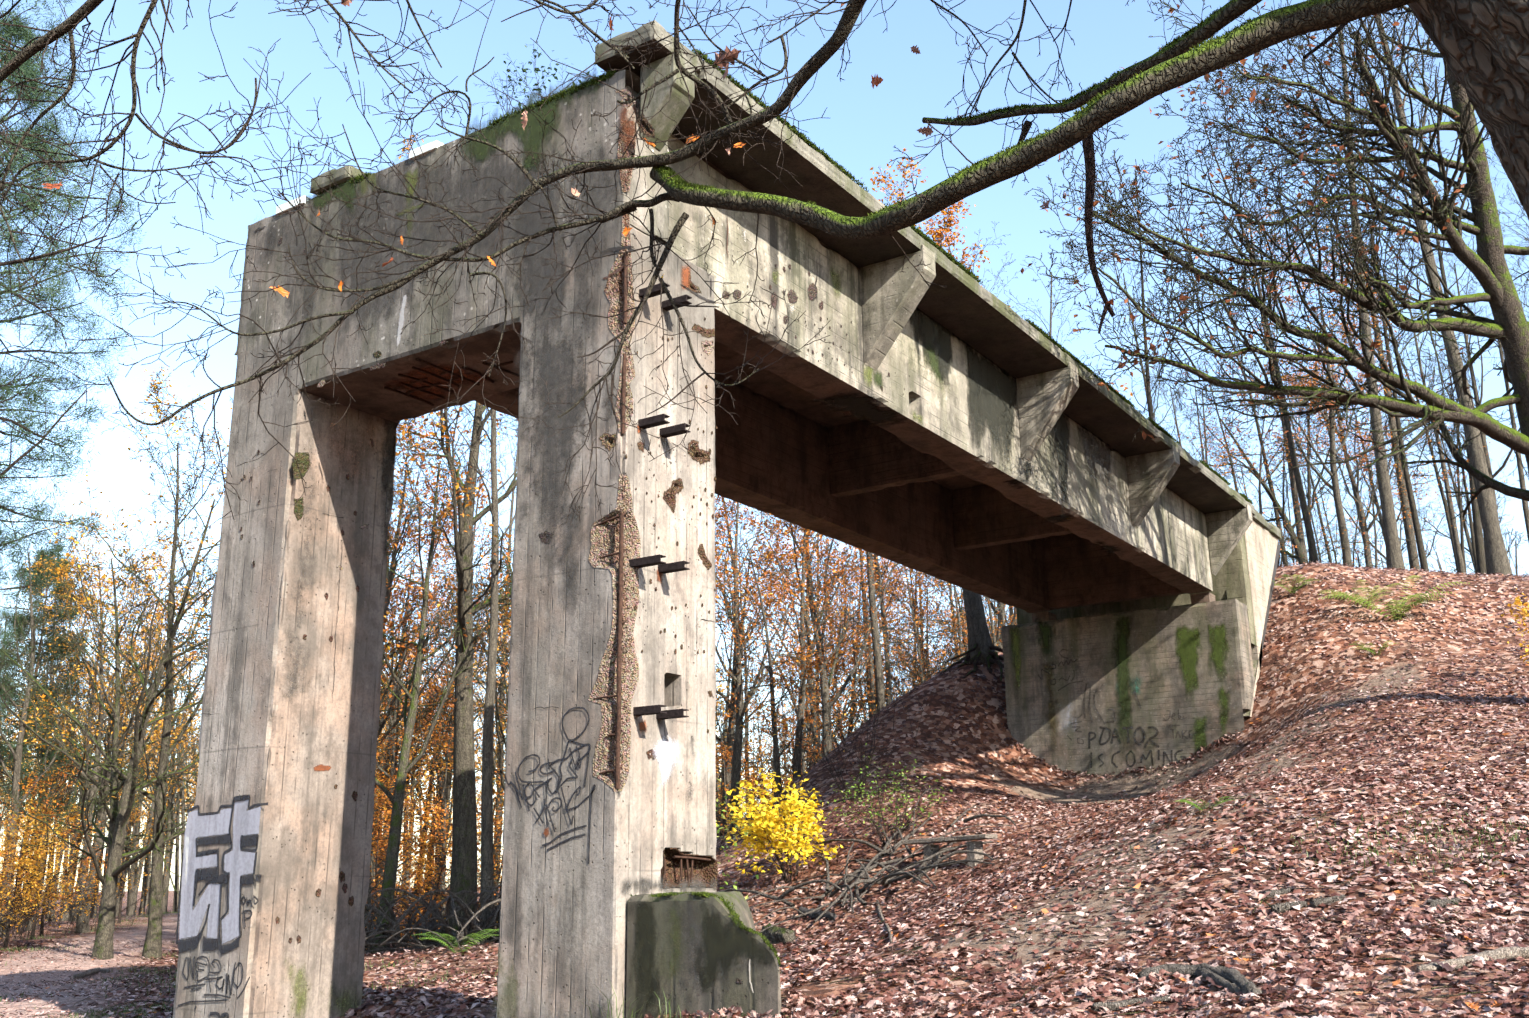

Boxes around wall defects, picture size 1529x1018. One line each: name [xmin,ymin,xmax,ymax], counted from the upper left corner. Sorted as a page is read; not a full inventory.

water stain [910,307,1017,460]
spalling [588,213,718,792]
water stain [1005,461,1031,489]
water stain [622,879,750,1012]